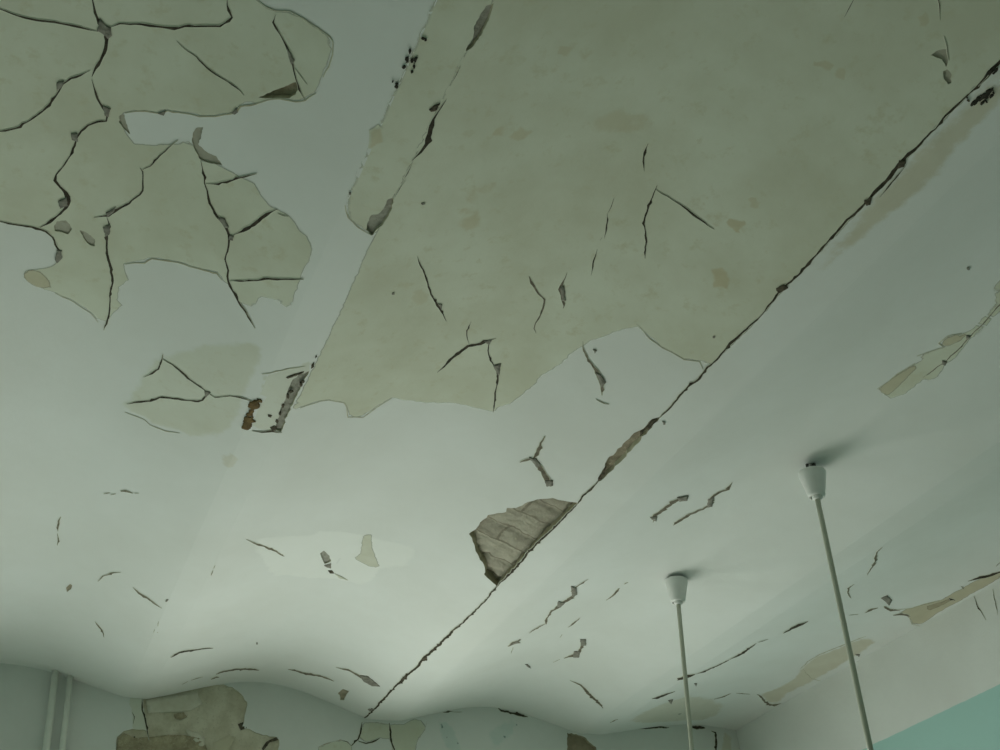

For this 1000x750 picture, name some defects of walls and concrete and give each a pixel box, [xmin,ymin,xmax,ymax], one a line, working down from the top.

peeling [0,0,334,322]
peeling [120,0,1000,439]
crack [660,59,1000,418]
crack [417,256,501,412]
spalling [116,685,279,750]
corrosion [241,398,262,430]
crack [288,481,598,750]
spalling [469,498,577,586]
crack [520,436,553,487]
crack [507,579,618,723]
crack [650,482,733,525]
peeling [899,573,1000,626]